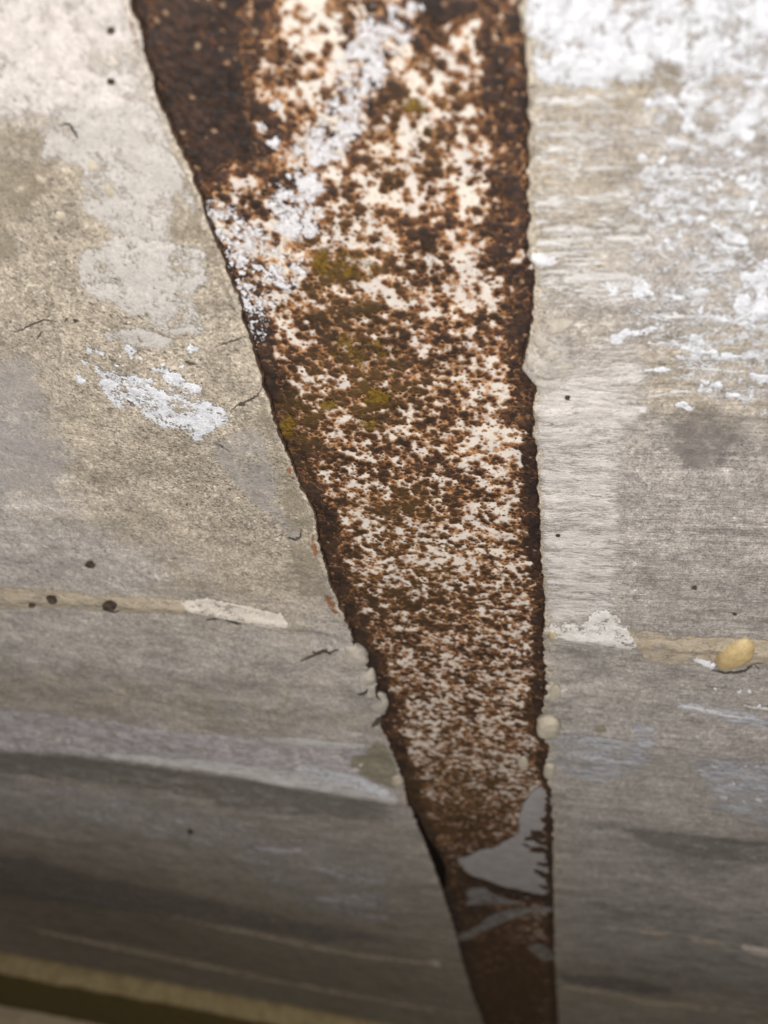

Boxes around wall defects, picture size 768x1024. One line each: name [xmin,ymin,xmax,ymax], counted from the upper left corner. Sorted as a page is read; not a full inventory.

water stain [532,86,652,309]
efflorescence [75,343,230,441]
water stain [649,389,698,397]
rust [130,0,558,1024]
crack [300,649,338,662]
efflorescence [548,610,637,650]
crack [371,717,382,728]
crack [414,811,446,887]